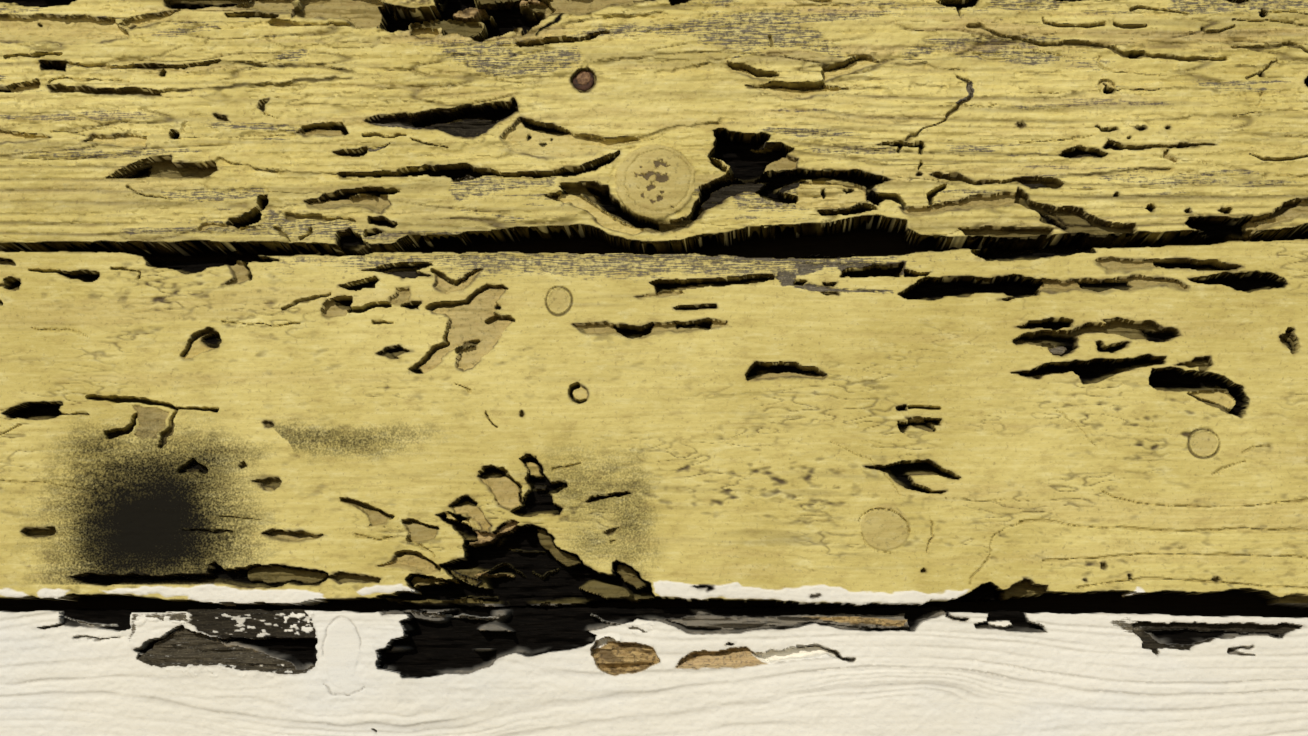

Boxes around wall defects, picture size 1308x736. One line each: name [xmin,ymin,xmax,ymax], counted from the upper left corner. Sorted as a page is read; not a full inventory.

spalling [0,2,249,45]
peeling [593,33,1064,101]
spalling [0,59,726,159]
spalling [586,188,659,230]
spalling [816,188,878,216]
spalling [900,191,1067,251]
spalling [1034,258,1242,295]
spalling [448,464,524,531]
spalling [338,496,441,574]
peeling [129,608,318,676]
spalling [674,643,857,670]
spalling [1142,628,1282,646]